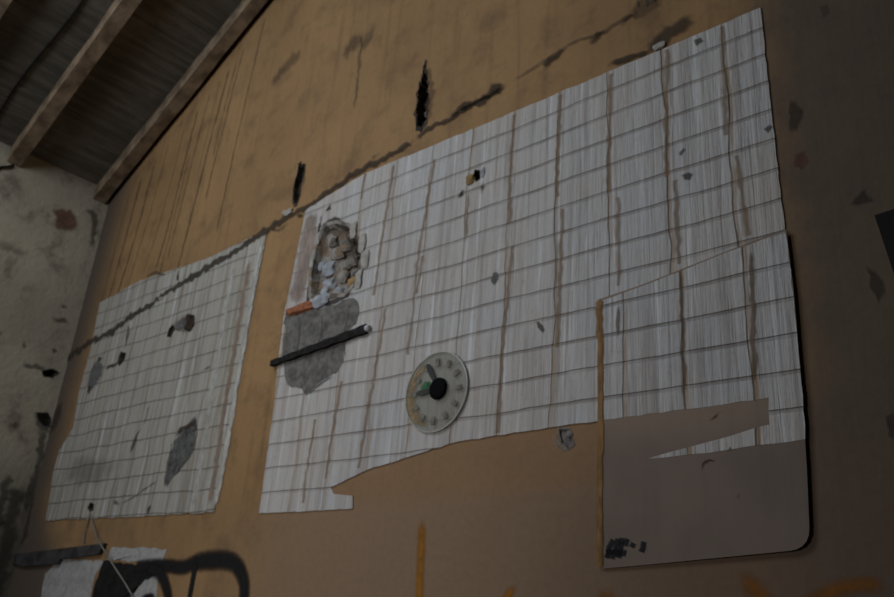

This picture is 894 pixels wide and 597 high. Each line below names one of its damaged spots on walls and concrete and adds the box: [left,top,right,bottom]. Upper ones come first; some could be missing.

peeling [612,17,689,64]
spalling [167,314,194,337]
spalling [282,206,370,395]
crack [67,0,652,360]
corrosion [413,159,435,308]
corrosion [664,49,686,391]
corrosion [749,256,757,377]
peeling [164,417,197,487]
corrosion [595,300,604,567]